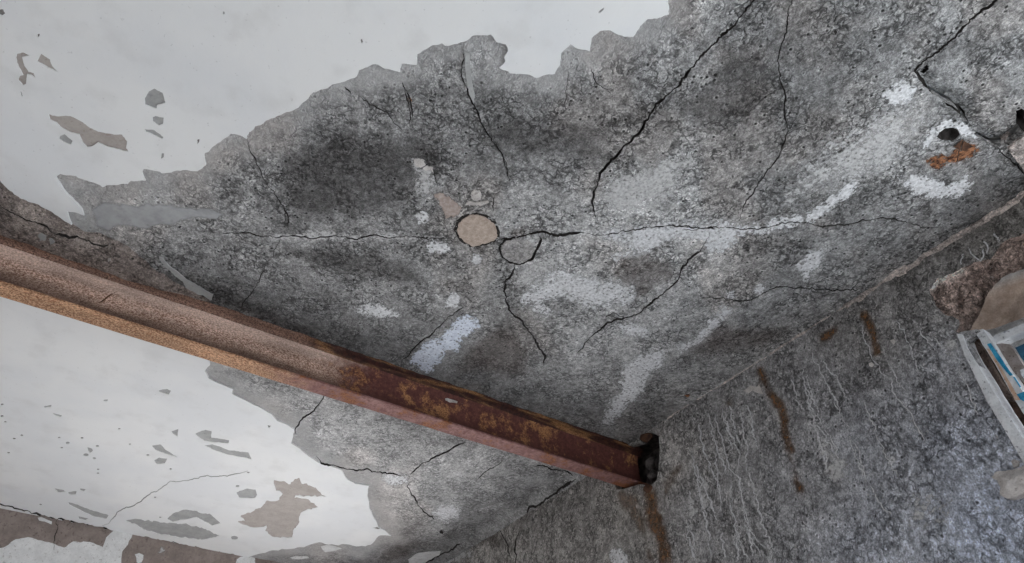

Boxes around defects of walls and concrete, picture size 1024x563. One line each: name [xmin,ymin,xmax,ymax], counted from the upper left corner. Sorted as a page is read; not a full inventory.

crack [914,0,997,161]
crack [217,141,454,308]
damp [264,211,451,254]
efflorescence [412,158,436,195]
peeling [49,0,1024,444]
crack [498,0,938,364]
corrosion [926,139,979,170]
peeling [196,430,251,459]
peeling [206,361,587,563]
corrosion [758,367,795,460]
peeling [0,510,220,563]
corrosion [618,467,680,562]